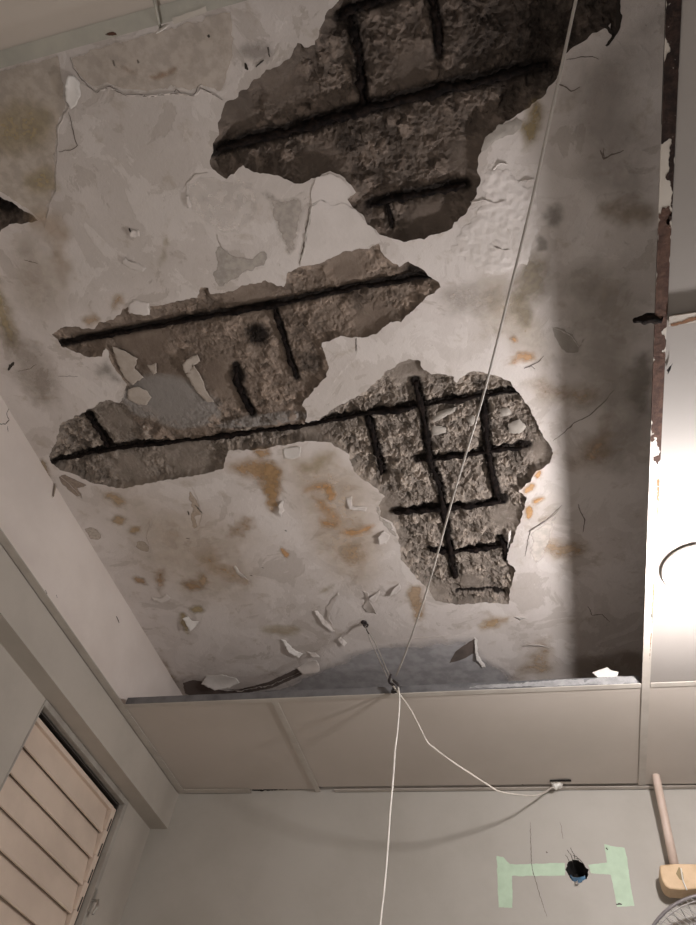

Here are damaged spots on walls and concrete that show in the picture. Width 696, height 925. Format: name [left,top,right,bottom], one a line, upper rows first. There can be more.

crack [70,59,222,100]
spalling [0,197,38,232]
corrosion [651,0,696,464]
spalling [49,0,617,605]
corrosion [236,450,280,510]
peeling [183,616,199,631]
peeling [314,593,347,647]
peeling [362,591,377,615]
peeling [183,633,637,695]